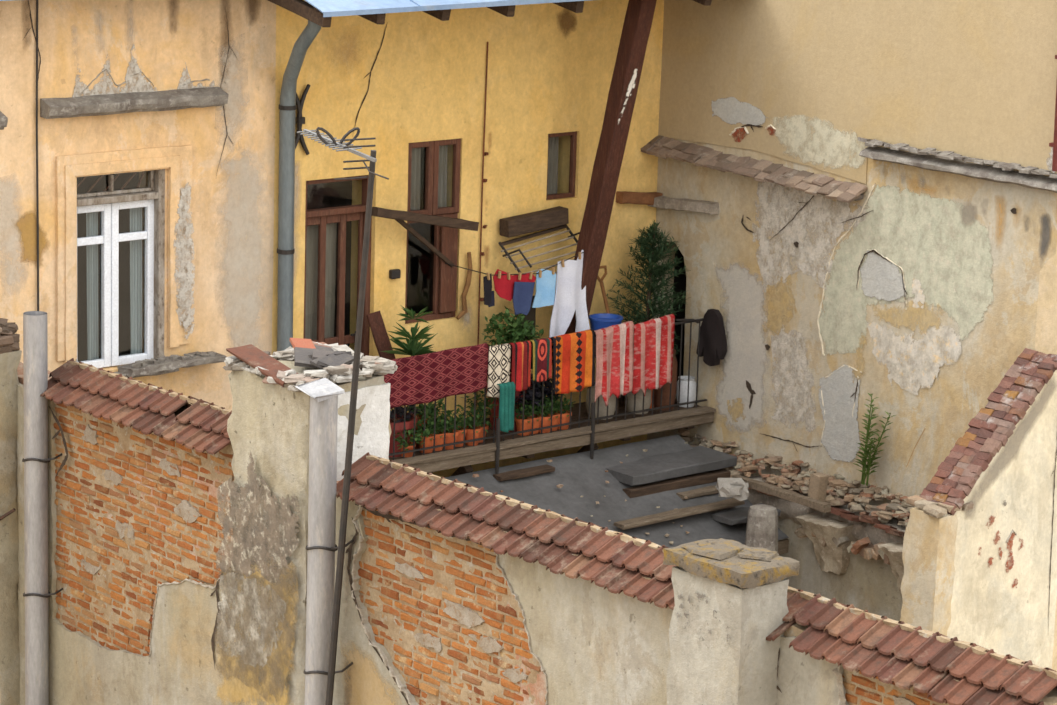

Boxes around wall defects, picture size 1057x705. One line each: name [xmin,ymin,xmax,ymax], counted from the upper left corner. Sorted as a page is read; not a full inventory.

water stain [249,0,258,20]
peeling [72,44,157,97]
peeling [177,62,215,89]
crack [216,10,238,175]
crack [352,25,387,137]
peeling [711,97,867,169]
peeling [173,183,195,339]
peeling [715,181,993,462]
spalling [54,403,287,667]
spalling [351,505,548,705]
flaking render [978,516,1023,588]
spalling [832,668,949,705]